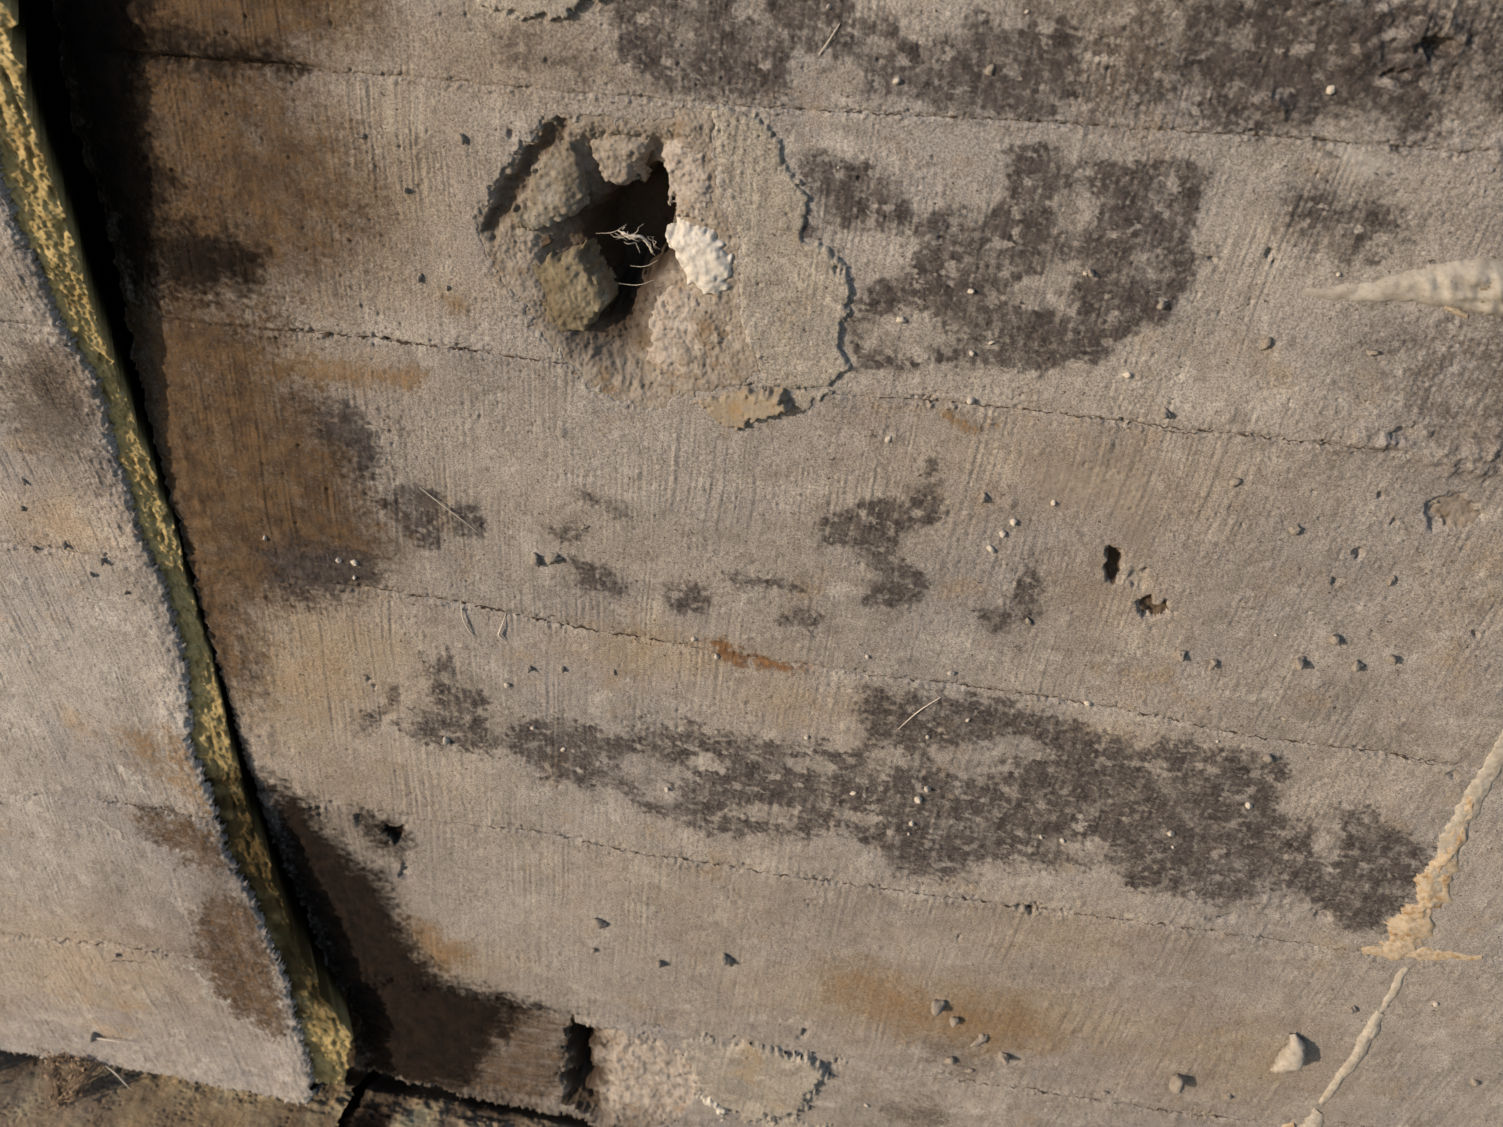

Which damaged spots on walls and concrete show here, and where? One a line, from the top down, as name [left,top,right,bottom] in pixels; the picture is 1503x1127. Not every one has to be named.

peeling [476,0,604,22]
water stain [491,32,595,87]
water stain [614,0,1503,152]
spalling [476,101,852,431]
water stain [800,142,1213,377]
water stain [53,0,485,698]
water stain [549,527,627,594]
water stain [666,582,710,614]
water stain [359,648,1436,932]
water stain [259,773,544,1093]
spalling [410,1002,835,1127]